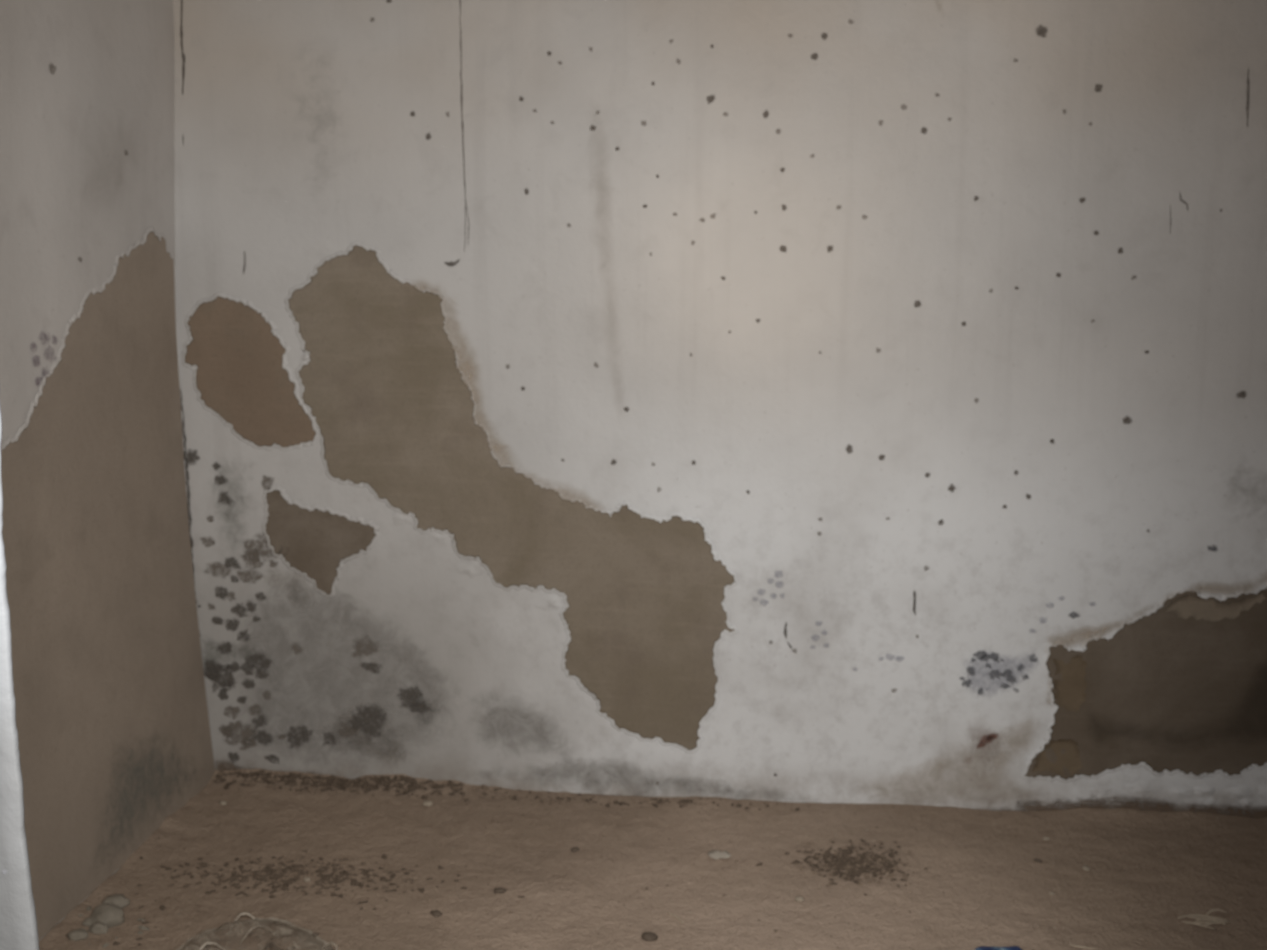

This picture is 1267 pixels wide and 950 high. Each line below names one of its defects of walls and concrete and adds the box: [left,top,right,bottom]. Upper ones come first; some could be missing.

crack [446,0,469,266]
flaking render [1,226,739,940]
water stain [960,651,1037,694]
flaking render [1021,581,1267,783]